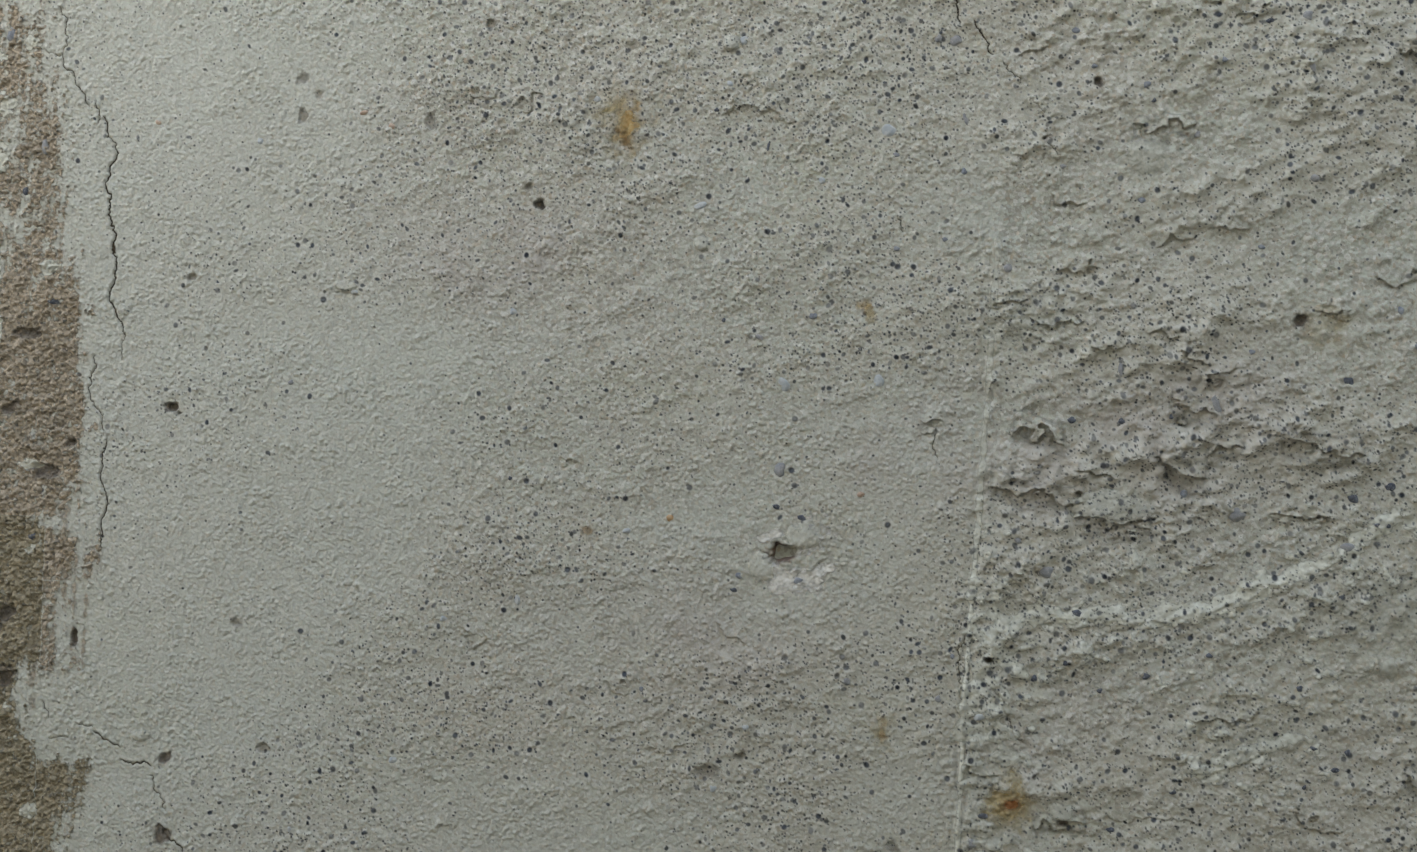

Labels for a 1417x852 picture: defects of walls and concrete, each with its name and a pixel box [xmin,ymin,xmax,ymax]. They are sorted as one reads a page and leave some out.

peeling [0,0,101,852]
crack [41,10,125,549]
rust [992,794,1023,818]